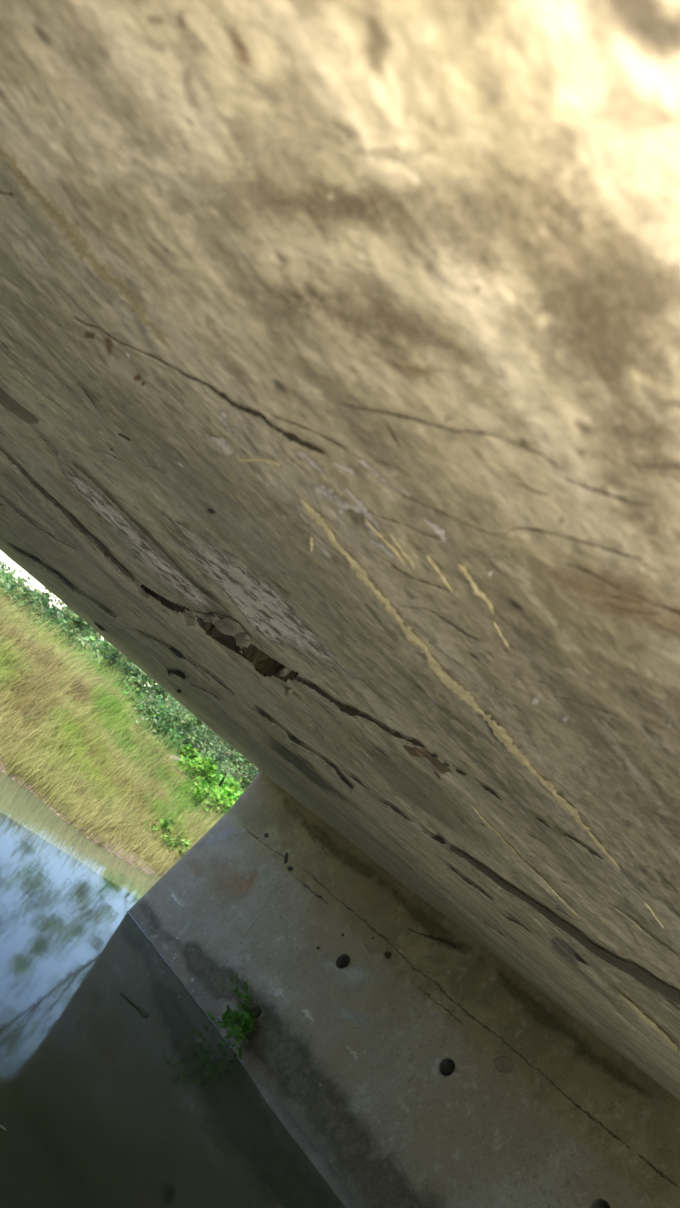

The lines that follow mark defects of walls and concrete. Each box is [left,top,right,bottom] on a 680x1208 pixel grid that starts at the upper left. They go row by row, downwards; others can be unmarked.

peeling [0,388,38,423]
crack [0,448,134,617]
crack [69,383,230,614]
peeling [42,438,363,698]
crack [73,317,348,454]
crack [339,403,680,641]
crack [139,634,680,1013]
water stain [173,937,436,1208]
crack [247,830,677,1186]